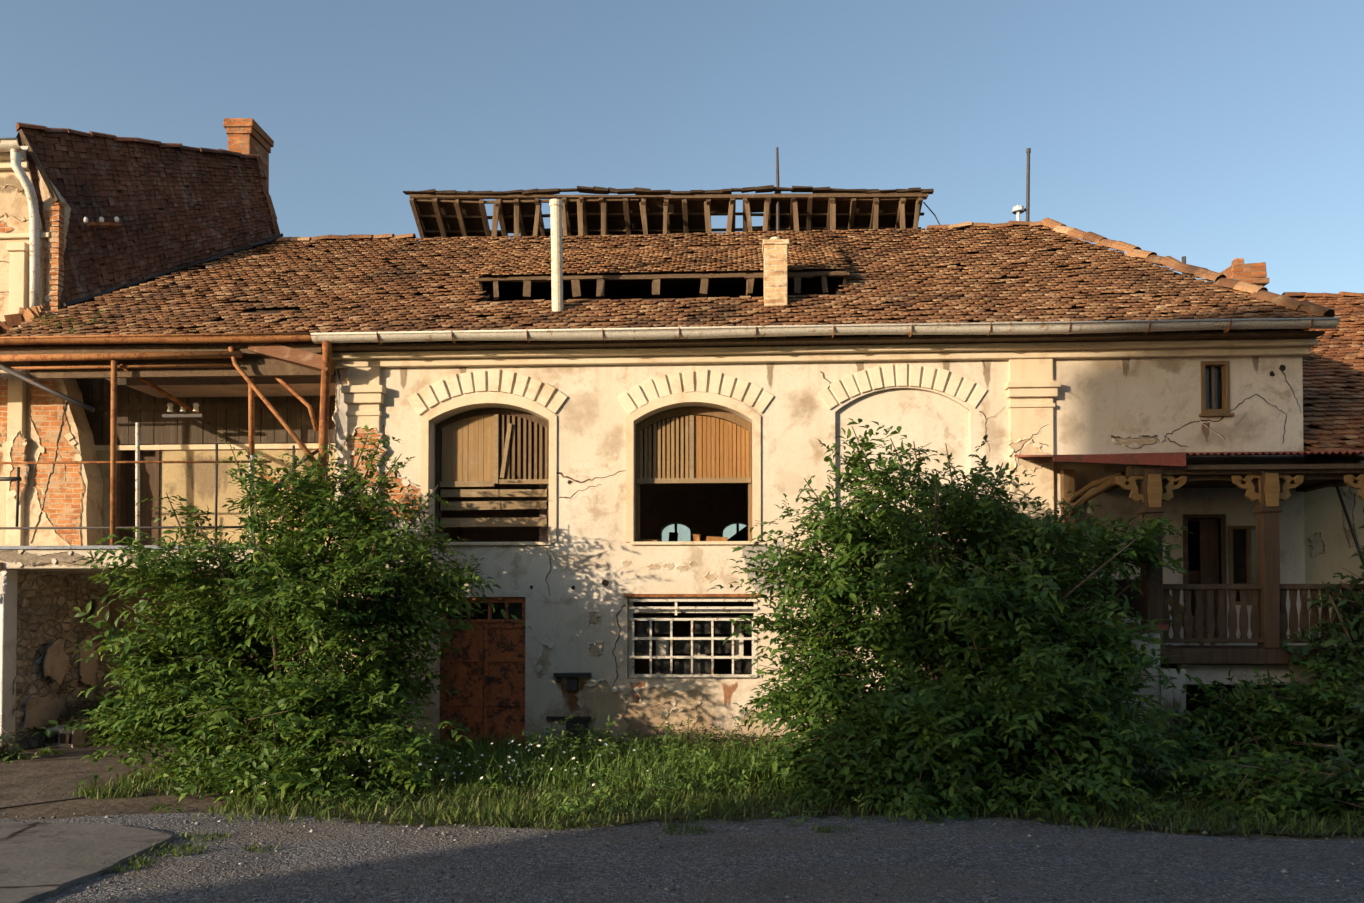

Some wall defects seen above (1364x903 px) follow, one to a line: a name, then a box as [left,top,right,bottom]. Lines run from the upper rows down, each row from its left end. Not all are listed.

peeling [0,184,51,337]
crack [1110,371,1302,449]
peeling [0,375,86,605]
crack [557,470,626,501]
crack [610,603,626,687]
peeling [575,678,704,745]